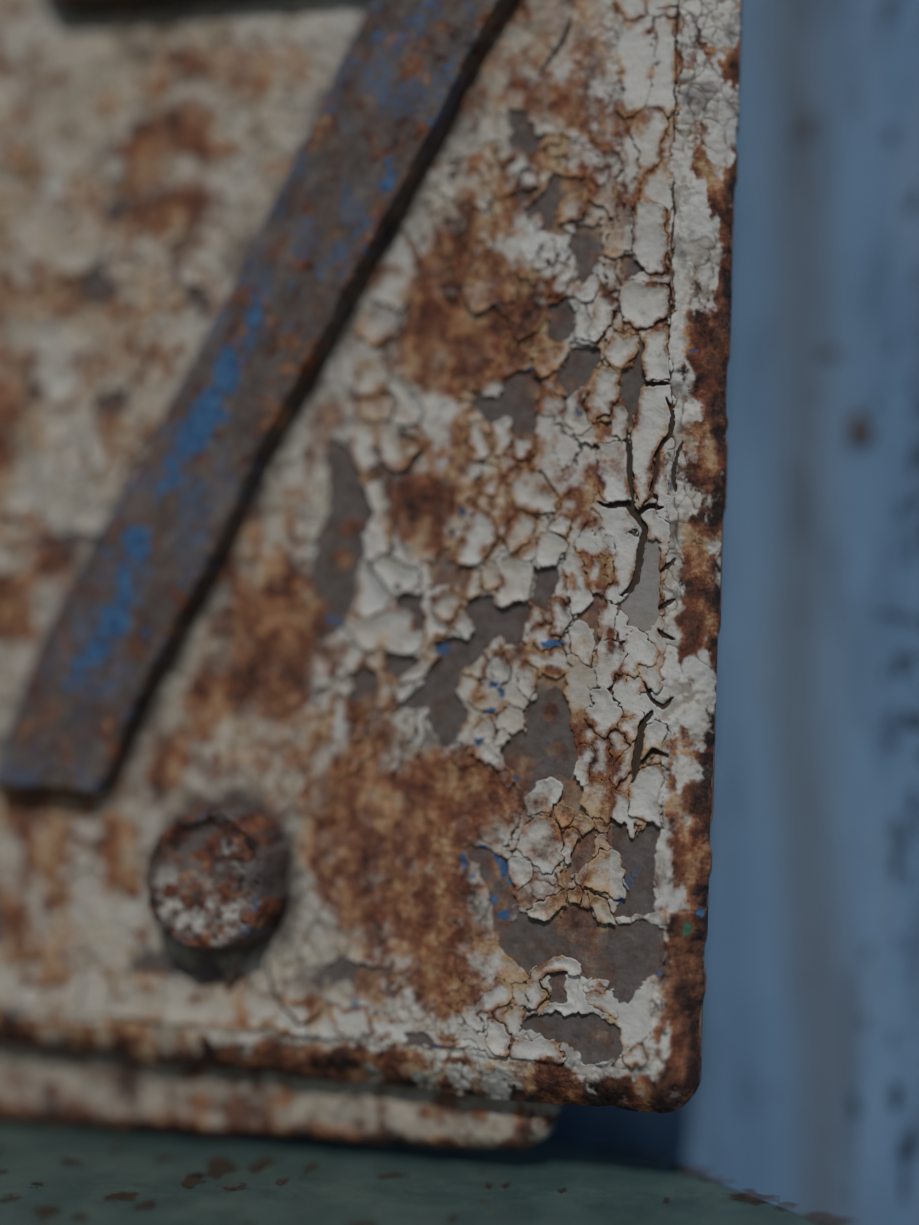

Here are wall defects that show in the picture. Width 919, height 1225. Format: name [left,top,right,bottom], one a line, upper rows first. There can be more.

crack [661,0,680,142]
rust [688,23,740,108]
rust [100,28,306,234]
crack [669,183,677,253]
crack [666,284,674,327]
crack [398,433,420,441]
peeling [0,0,685,1069]
crack [598,381,684,640]
rust [0,122,737,1113]
crack [631,682,674,782]
crack [214,956,329,1026]